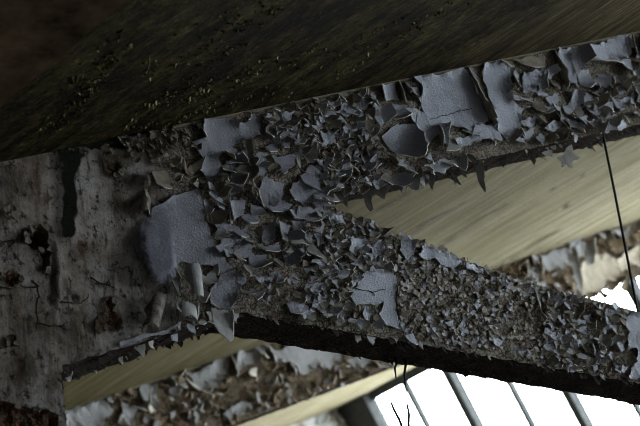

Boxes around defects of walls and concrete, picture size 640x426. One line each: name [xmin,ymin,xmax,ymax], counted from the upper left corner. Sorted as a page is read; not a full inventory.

peeling [63,32,640,387]
crack [3,231,28,256]
spalling [22,224,52,275]
crack [20,276,114,332]
peeling [0,337,395,426]